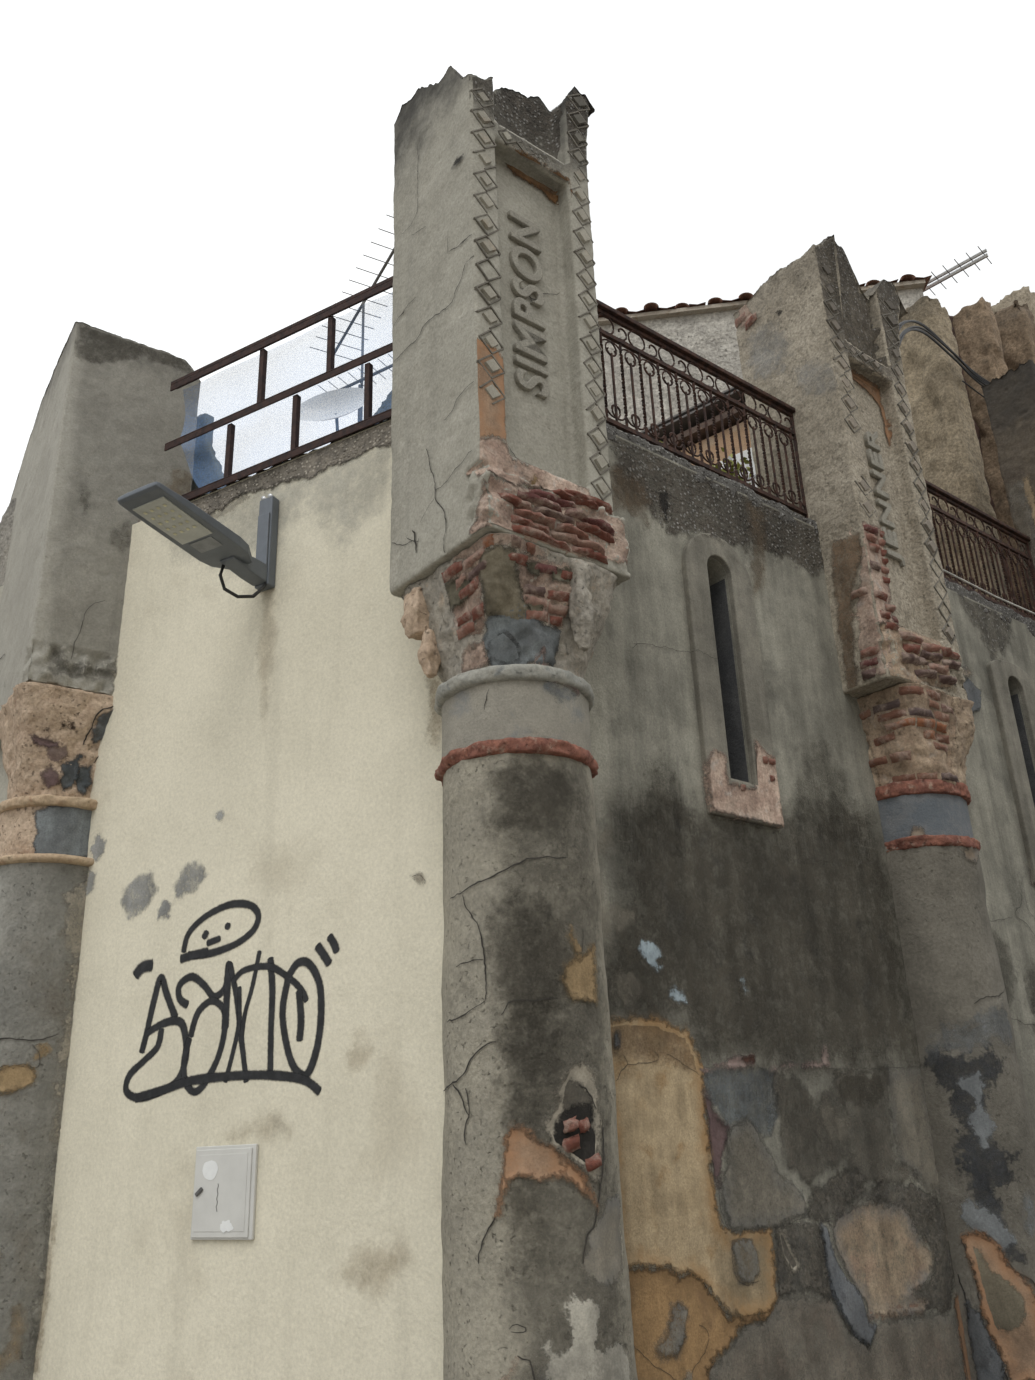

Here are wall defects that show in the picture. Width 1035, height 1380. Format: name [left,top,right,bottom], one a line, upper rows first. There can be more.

spalling [441,338,629,701]
peeling [30,706,114,857]
spalling [831,521,982,786]
peeling [30,1160,57,1368]
peeling [0,878,88,1096]
crack [443,856,566,1144]
peeling [562,925,598,1003]
peeling [478,1016,1035,1380]
leakage [499,761,1034,1380]